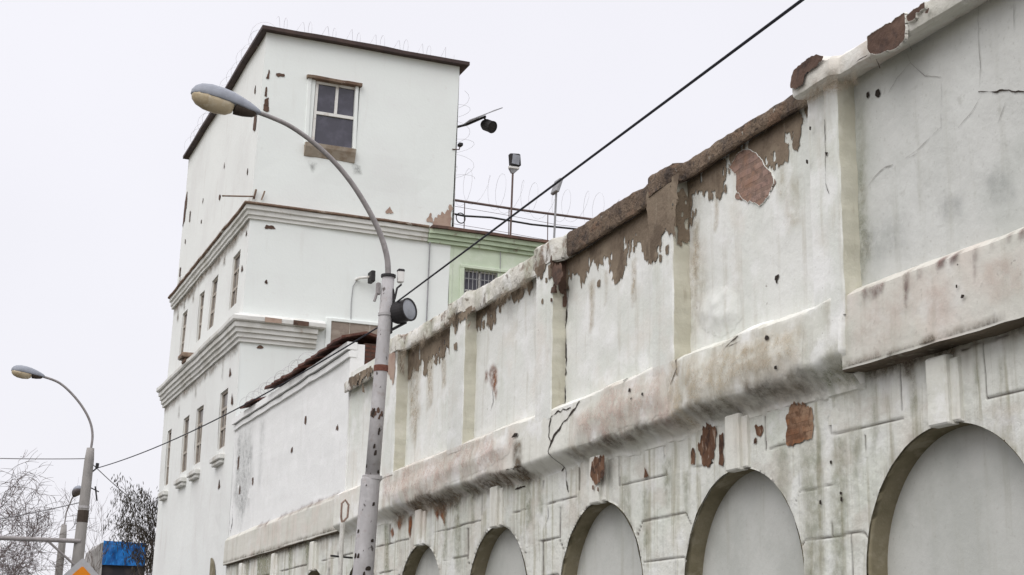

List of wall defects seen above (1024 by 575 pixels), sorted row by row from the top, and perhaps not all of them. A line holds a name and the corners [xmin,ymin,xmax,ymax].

spalling [867,2,929,56]
spalling [790,54,823,89]
crack [868,40,1024,186]
peeling [408,105,811,380]
crack [548,288,579,490]
peeling [691,422,724,468]
spalling [785,402,813,446]
peeling [590,455,605,492]